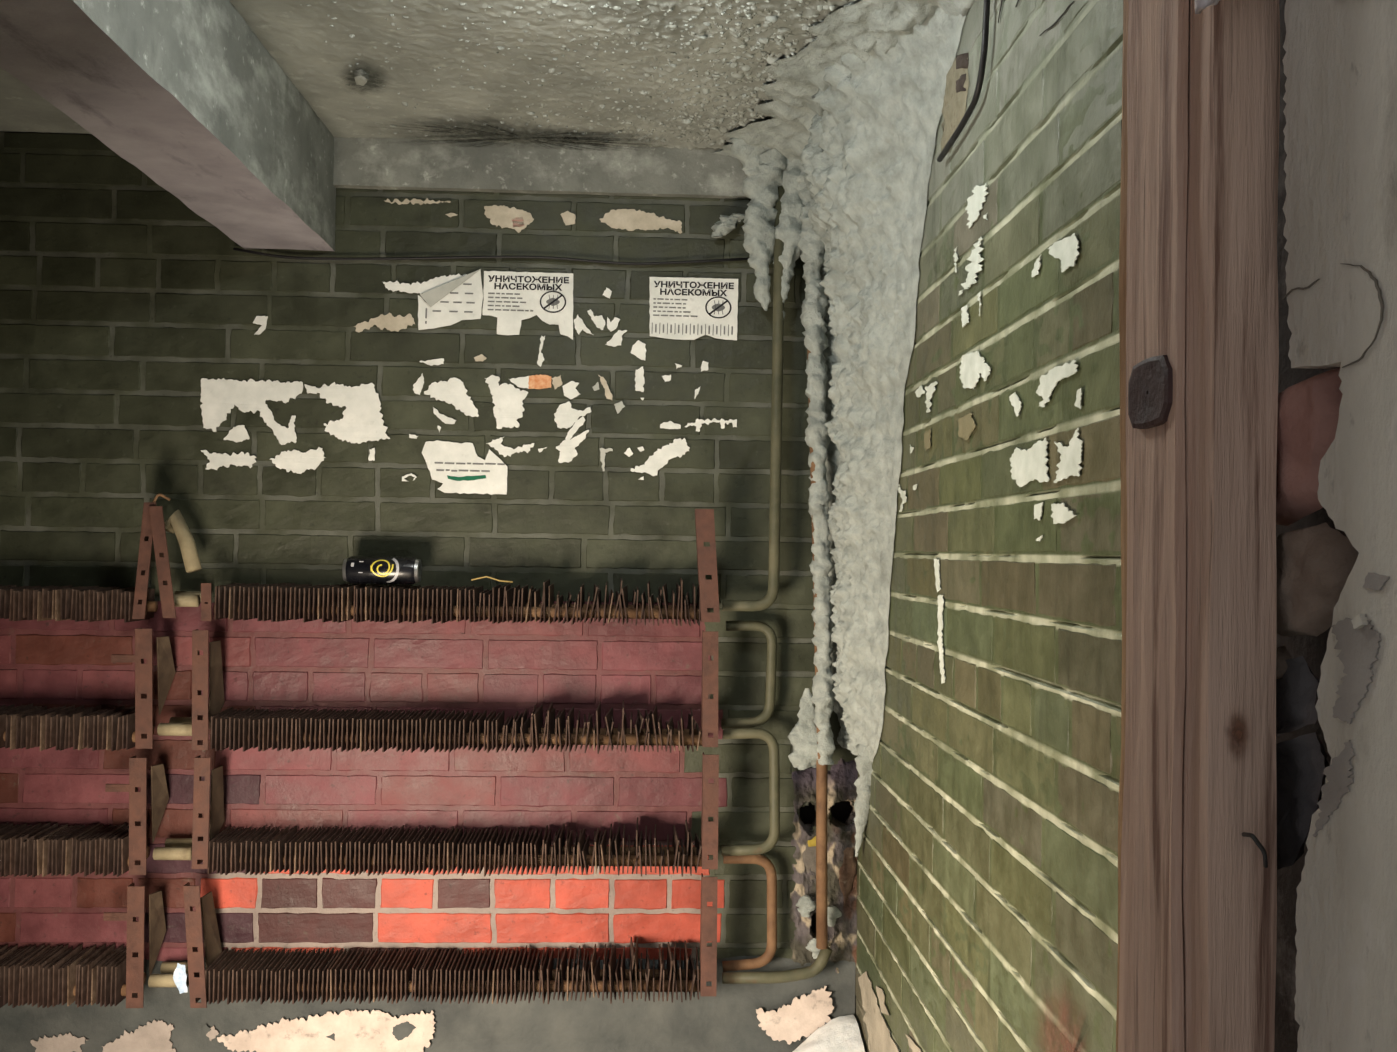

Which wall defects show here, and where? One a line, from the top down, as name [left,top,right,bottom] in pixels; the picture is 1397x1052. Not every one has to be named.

peeling [484,205,534,233]
peeling [600,209,682,234]
peeling [953,183,988,327]
peeling [1032,233,1080,277]
peeling [959,351,991,389]
peeling [1036,360,1083,409]
peeling [1010,427,1083,487]
peeling [1034,502,1077,541]
spalling [1276,367,1390,870]
spalling [756,758,921,1052]
peeling [31,1019,176,1052]
peeling [200,1009,436,1052]